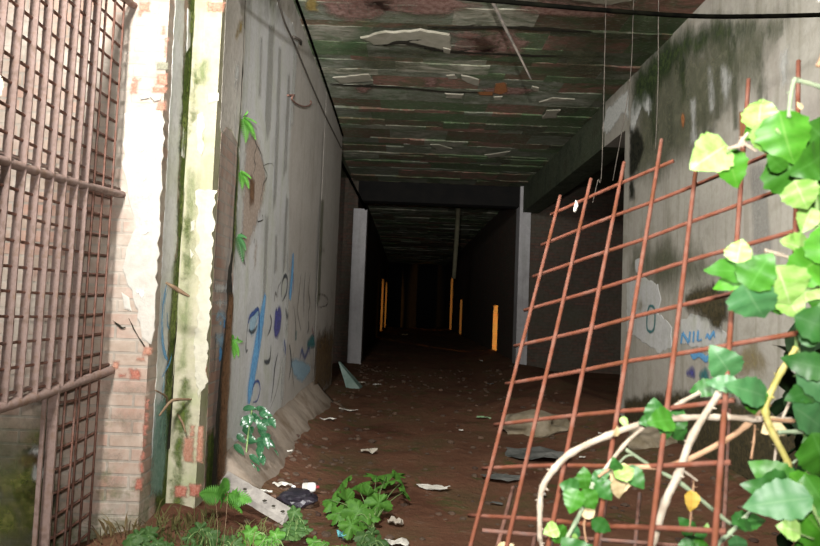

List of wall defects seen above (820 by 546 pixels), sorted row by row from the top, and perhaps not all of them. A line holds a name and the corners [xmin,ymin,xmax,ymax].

spalling [519,0,632,17]
peeling [360,28,530,58]
damp [186,47,204,94]
spalling [446,74,539,100]
peeling [539,97,574,119]
damp [602,19,759,198]
spalling [741,123,767,165]
peeling [121,0,191,490]
peeling [175,0,298,501]
damp [633,248,704,284]
damp [169,290,179,337]
spalling [467,138,800,546]